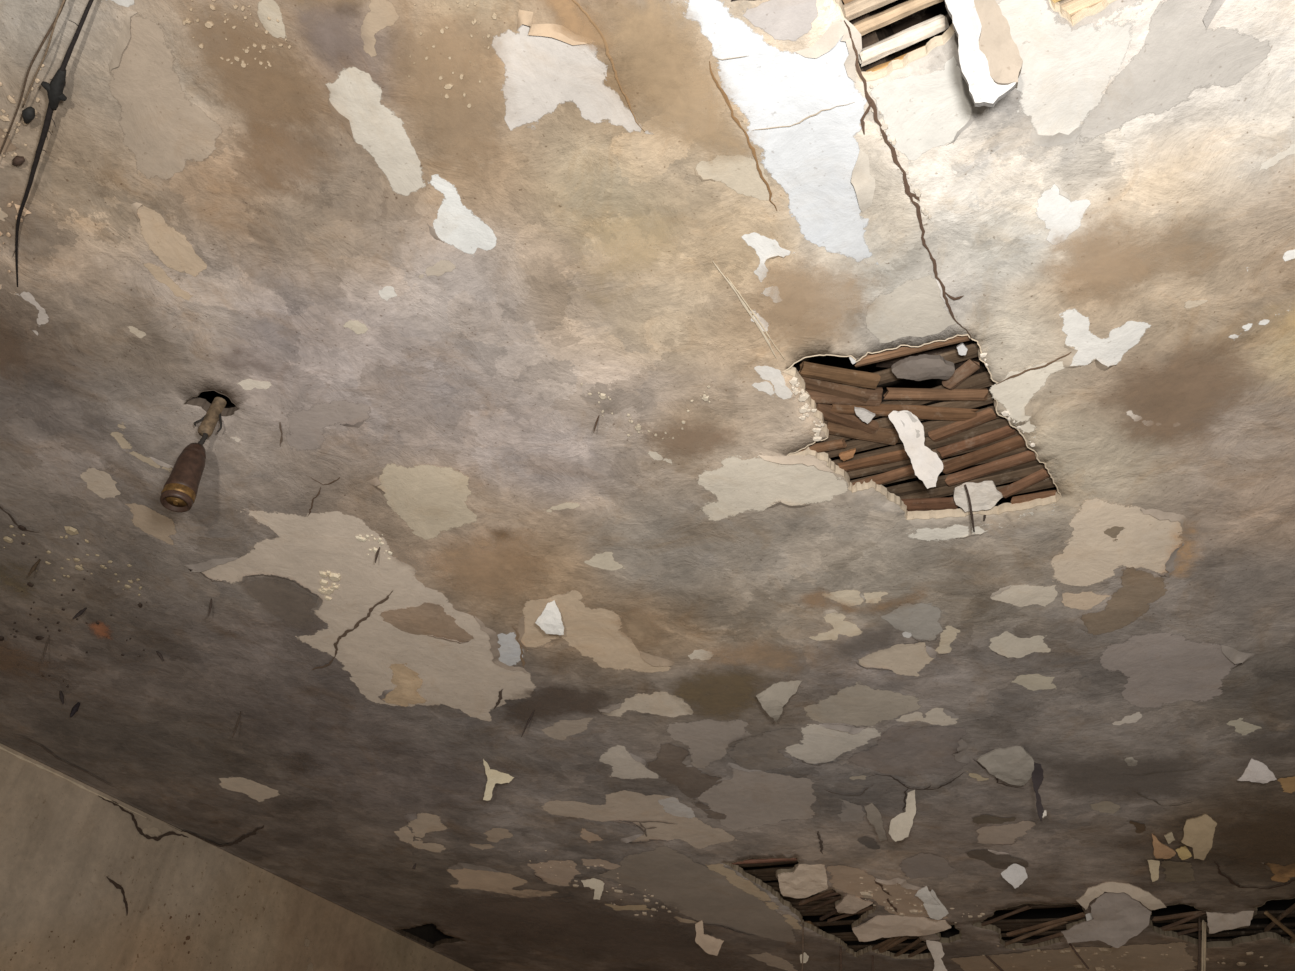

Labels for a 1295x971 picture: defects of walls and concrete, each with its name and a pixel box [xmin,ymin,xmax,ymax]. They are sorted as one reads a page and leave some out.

damp [207,23,297,130]
peeling [326,67,497,257]
peeling [492,10,653,134]
damp [550,0,745,152]
peeling [671,0,977,264]
crack [709,20,972,340]
peeling [698,275,1151,541]
crack [996,352,1071,385]
peeling [184,505,714,721]
crack [0,737,264,847]
peeling [447,590,1295,971]
crack [107,877,128,916]